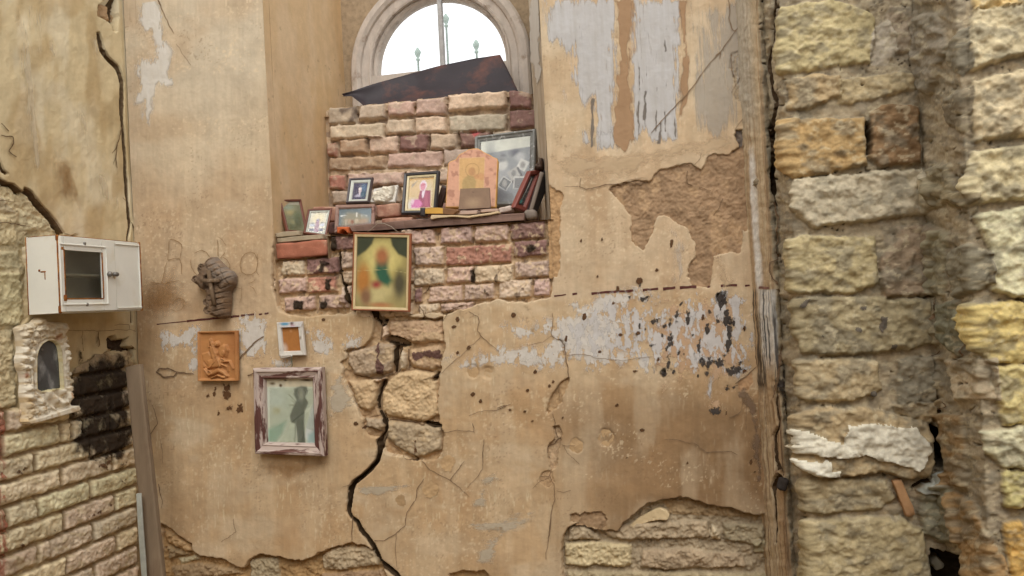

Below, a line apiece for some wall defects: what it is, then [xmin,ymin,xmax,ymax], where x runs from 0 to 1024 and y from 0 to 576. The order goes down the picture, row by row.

crack [0,123,70,235]
flaking render [0,185,141,576]
crack [96,0,134,241]
crack [339,252,510,576]
flaking render [571,512,607,531]
flaking render [630,506,670,527]
flaking render [610,130,748,288]
flaking render [652,296,753,392]
crack [729,0,787,543]
crack [911,478,931,487]